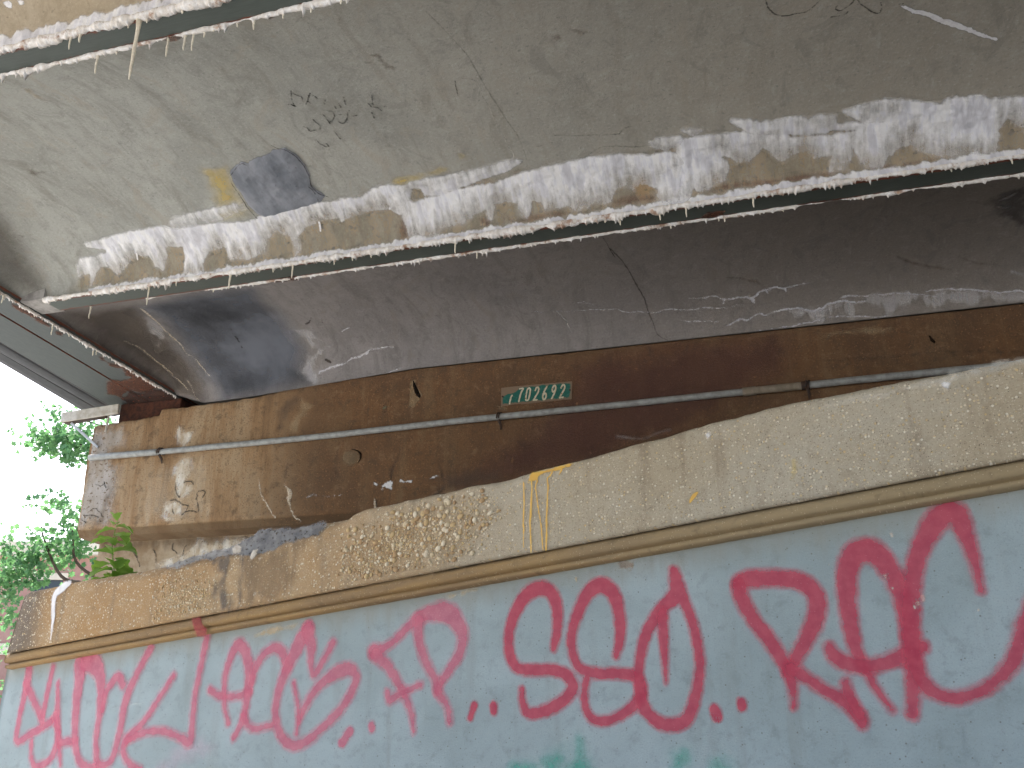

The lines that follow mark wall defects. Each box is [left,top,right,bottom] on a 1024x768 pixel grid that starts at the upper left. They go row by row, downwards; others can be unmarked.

efflorescence [0,0,350,84]
damp [0,95,1024,399]
corrosion [100,358,178,404]
spalling [150,523,326,620]
spalling [335,489,502,581]